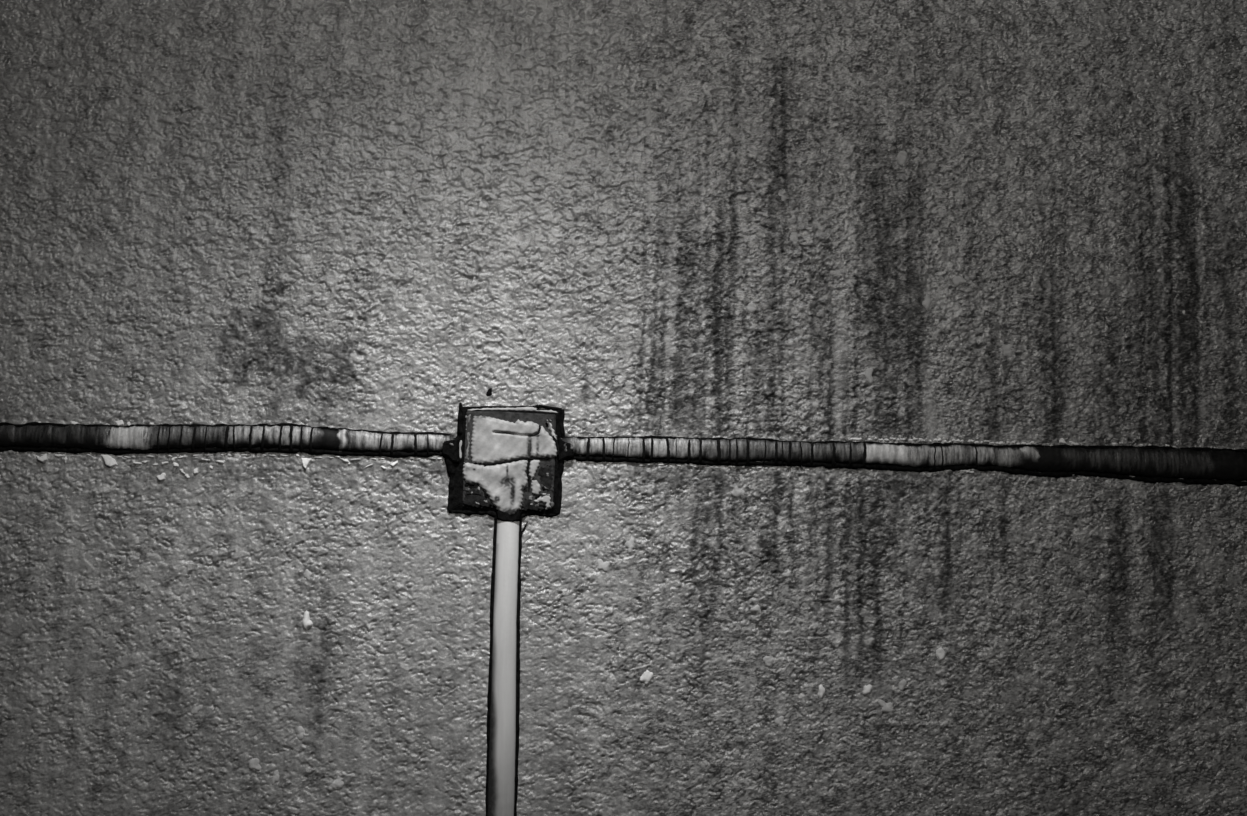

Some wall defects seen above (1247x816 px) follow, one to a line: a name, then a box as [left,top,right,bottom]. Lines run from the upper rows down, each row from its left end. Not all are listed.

damp [645,142,784,435]
damp [807,337,857,437]
damp [857,203,933,439]
damp [1137,152,1236,441]
damp [665,469,737,575]
damp [759,473,792,575]
damp [808,482,894,660]